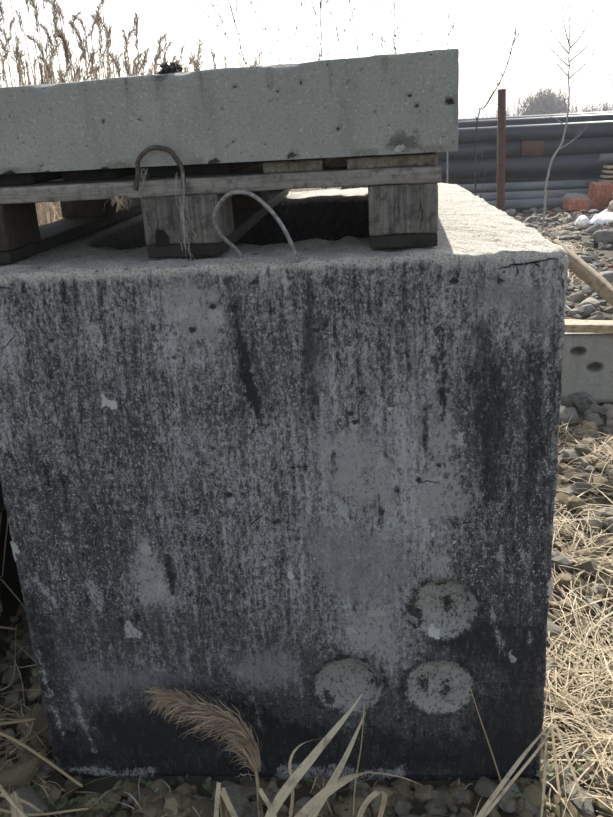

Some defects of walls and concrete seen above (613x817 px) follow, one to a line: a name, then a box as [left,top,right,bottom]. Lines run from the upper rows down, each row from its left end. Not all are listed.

leakage [59,278,81,402]
peeling [101,393,119,410]
leakage [229,276,262,441]
leakage [303,275,319,419]
leakage [424,325,450,422]
leakage [469,313,513,513]
peeling [125,620,144,639]
leakage [163,554,176,595]
leakage [28,599,546,781]
peeling [305,550,490,719]